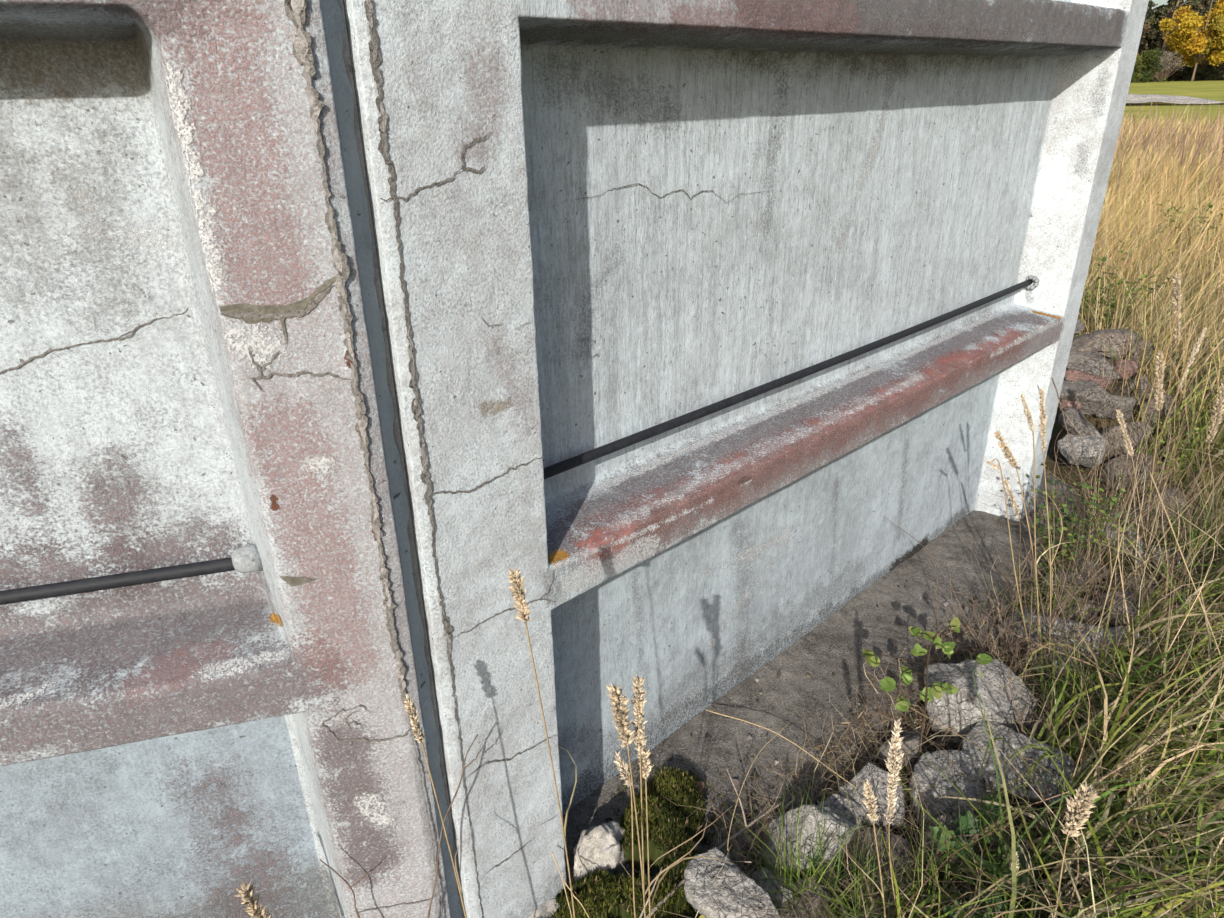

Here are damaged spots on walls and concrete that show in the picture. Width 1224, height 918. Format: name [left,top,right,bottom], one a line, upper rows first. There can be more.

crack [380,132,490,201]
crack [580,183,774,203]
crack [0,308,188,374]
crack [248,347,350,392]
crack [394,457,542,500]
rust [250,399,375,683]
crack [454,572,554,638]
crack [320,705,411,743]
crack [464,734,559,779]
crack [481,816,556,880]
crack [359,891,441,913]